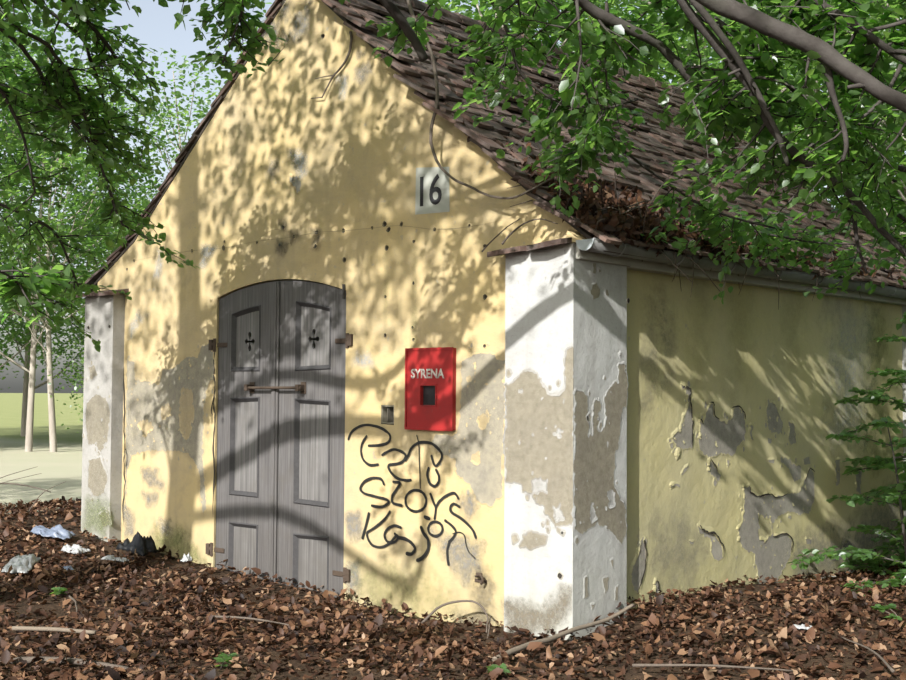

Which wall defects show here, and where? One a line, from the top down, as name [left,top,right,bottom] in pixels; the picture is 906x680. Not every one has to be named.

peeling [82,360,112,535]
peeling [122,342,216,519]
peeling [430,341,629,551]
peeling [583,575,595,610]
peeling [629,536,660,604]
peeling [667,379,815,584]